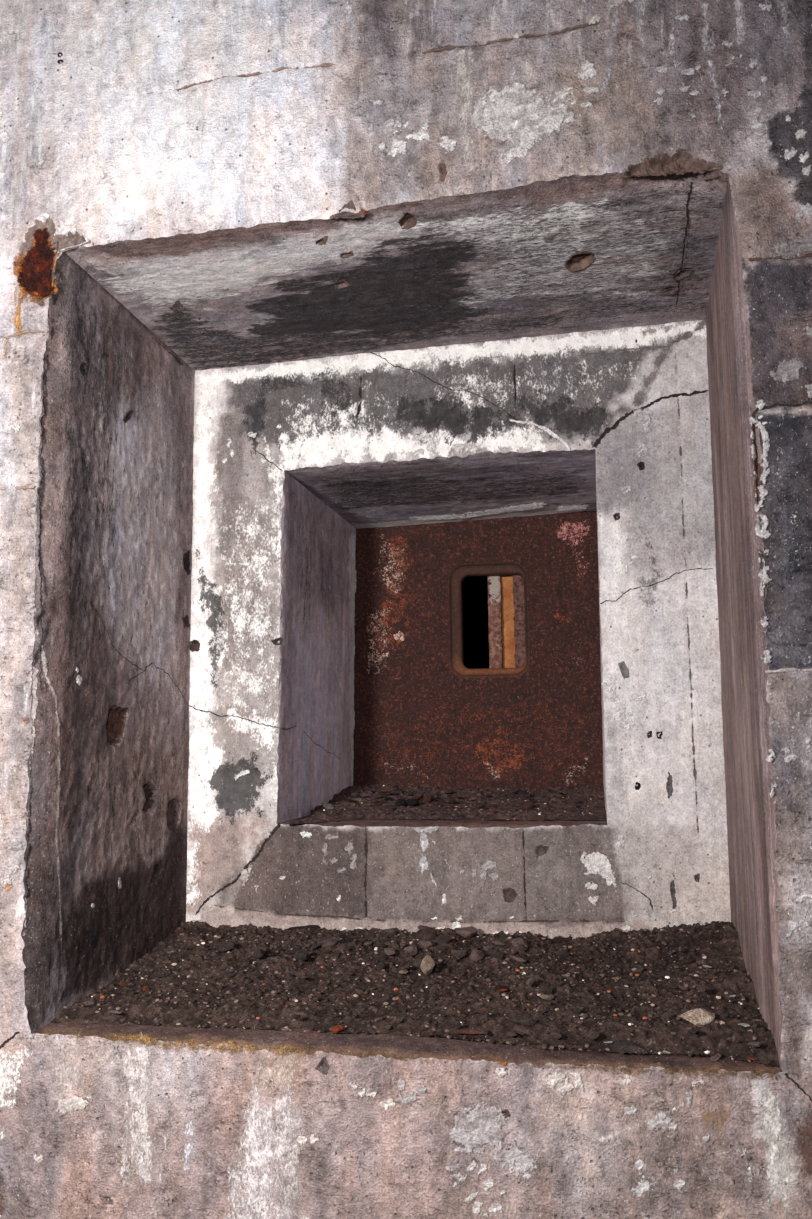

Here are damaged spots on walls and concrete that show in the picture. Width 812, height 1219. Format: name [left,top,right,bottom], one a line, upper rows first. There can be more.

crack [675,176,721,307]
corrosion [3,228,60,358]
leakage [633,319,706,407]
leakage [510,419,570,451]
crack [593,390,709,448]
crack [89,600,341,760]
crack [195,823,280,915]
crack [0,1031,19,1048]